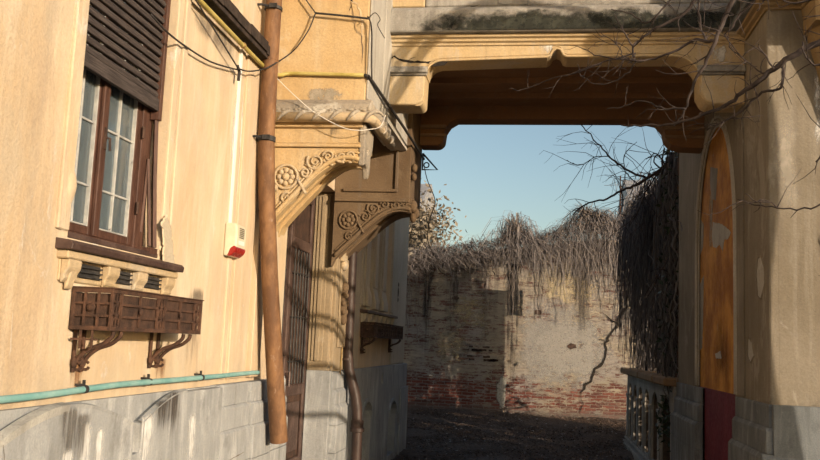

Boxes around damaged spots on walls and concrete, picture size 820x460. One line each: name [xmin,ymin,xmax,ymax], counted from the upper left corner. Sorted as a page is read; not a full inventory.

water stain [424,0,742,30]
peeling [709,167,731,251]
peeling [161,214,175,263]
water stain [507,241,519,356]
spalling [463,346,498,362]
water stain [62,410,104,460]
water stain [141,393,178,460]